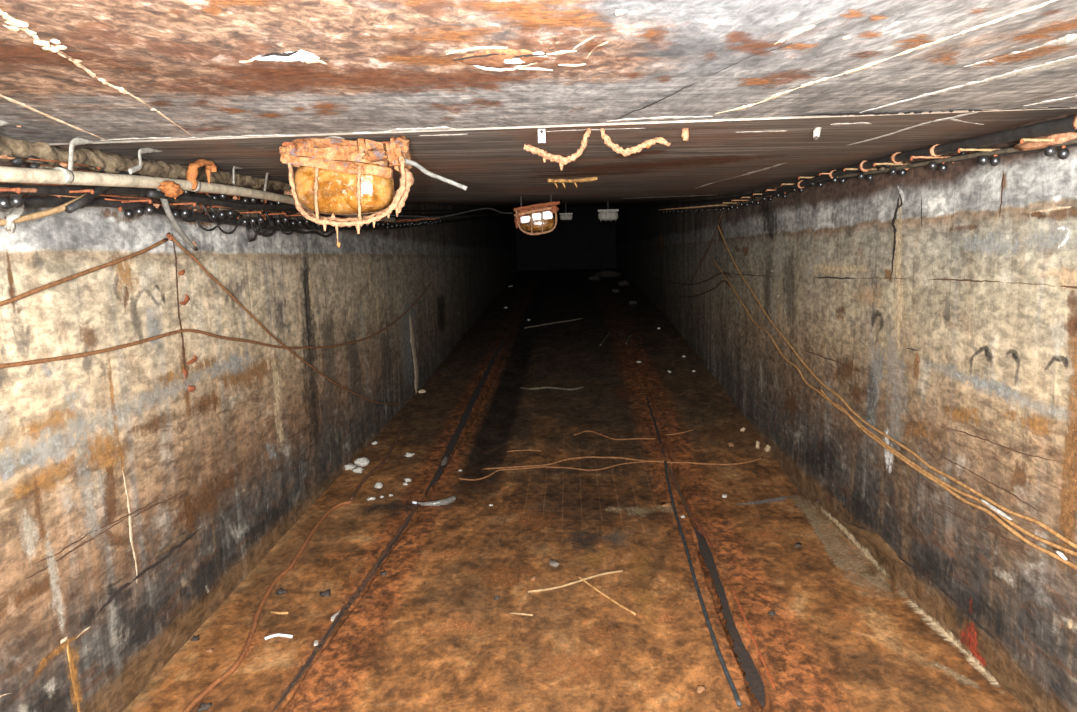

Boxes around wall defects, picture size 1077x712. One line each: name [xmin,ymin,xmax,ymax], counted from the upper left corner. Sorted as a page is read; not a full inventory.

rust [0,42,131,68]
spalling [240,50,331,77]
rust [179,56,539,116]
spalling [446,36,608,72]
rust [976,10,1077,68]
crack [998,171,1006,217]
crack [816,186,1077,353]
water stain [302,262,323,444]
crack [948,428,1059,462]
rust [1060,291,1077,568]
water stain [2,371,138,580]
water stain [908,598,1002,687]